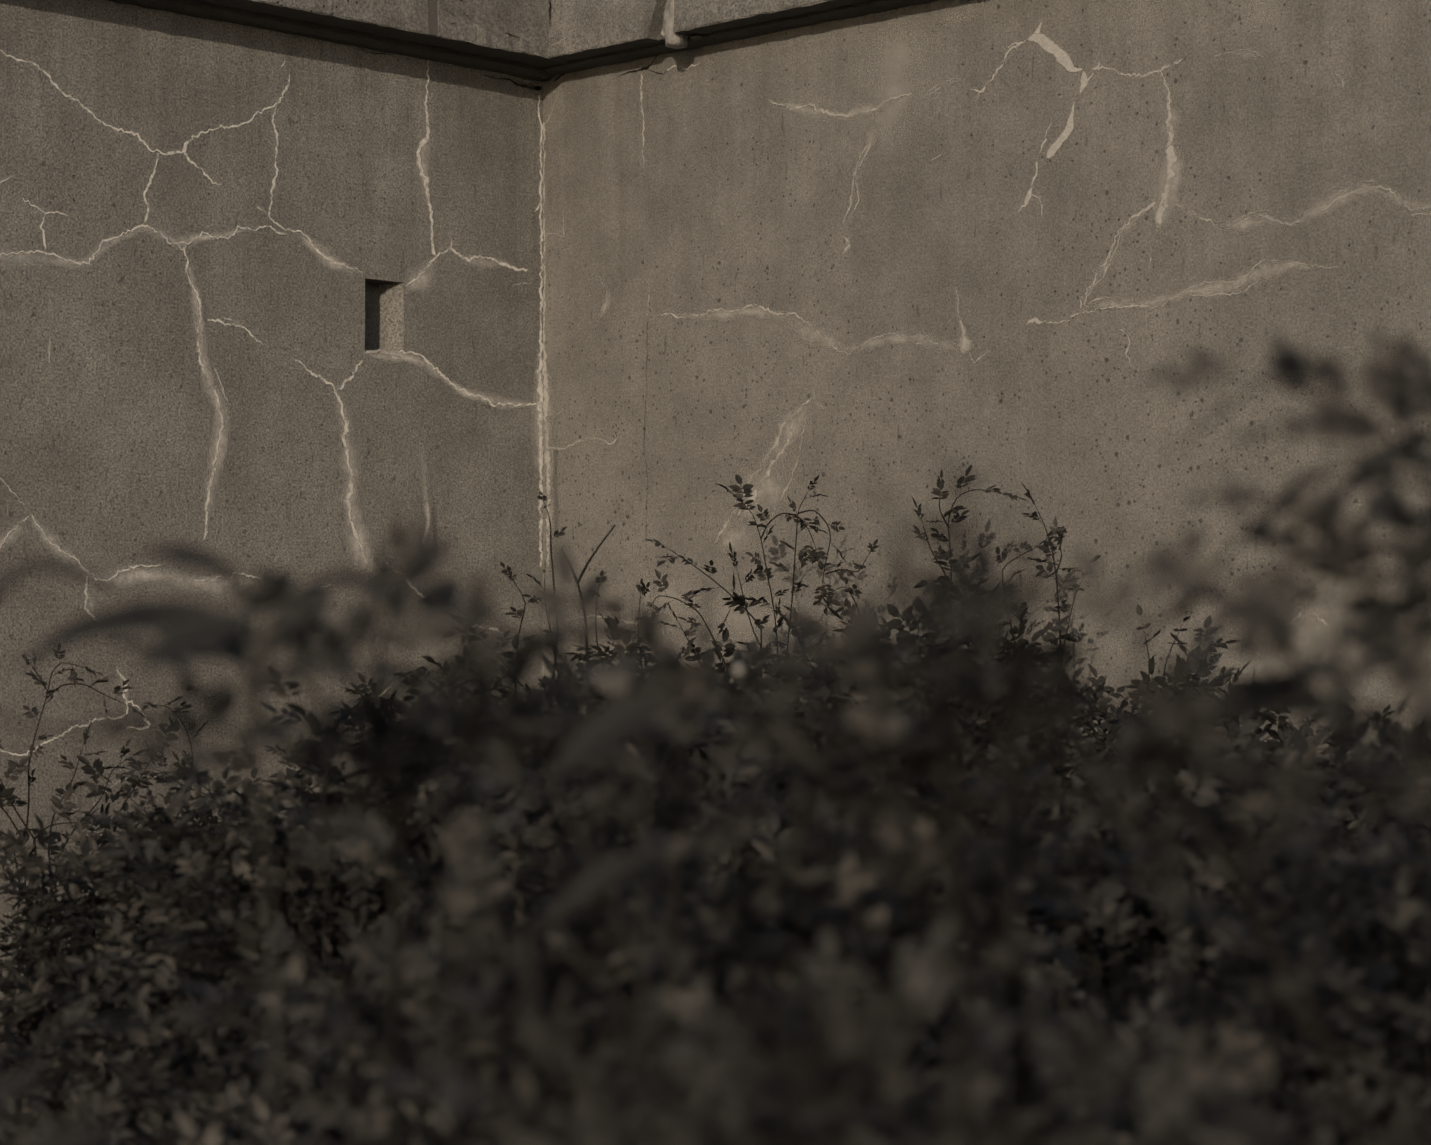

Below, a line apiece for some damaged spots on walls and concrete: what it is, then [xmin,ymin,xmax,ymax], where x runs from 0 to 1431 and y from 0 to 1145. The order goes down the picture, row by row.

crack [0,50,358,539]
crack [406,60,528,290]
crack [485,0,569,91]
crack [619,55,714,76]
crack [646,279,987,363]
crack [767,78,963,256]
spalling [970,22,1094,215]
crack [1026,49,1431,369]
crack [0,478,253,613]
crack [294,349,537,593]
crack [0,669,148,756]